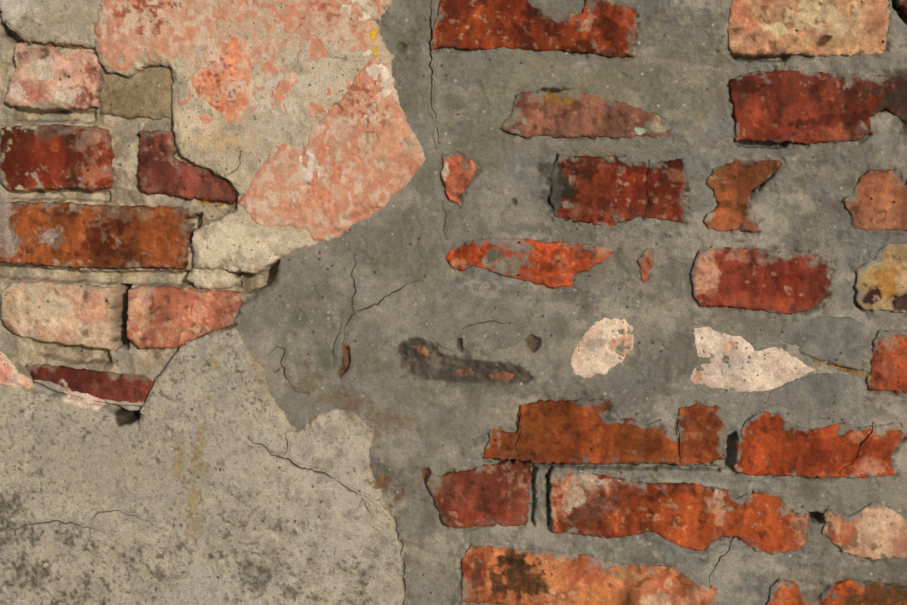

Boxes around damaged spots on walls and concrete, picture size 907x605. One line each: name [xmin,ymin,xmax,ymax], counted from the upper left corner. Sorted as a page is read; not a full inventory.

peeling [95,0,424,242]
crack [425,0,441,148]
spalling [0,351,144,414]
crack [267,343,309,396]
crack [331,256,425,375]
crack [4,508,160,538]
crack [247,434,408,605]